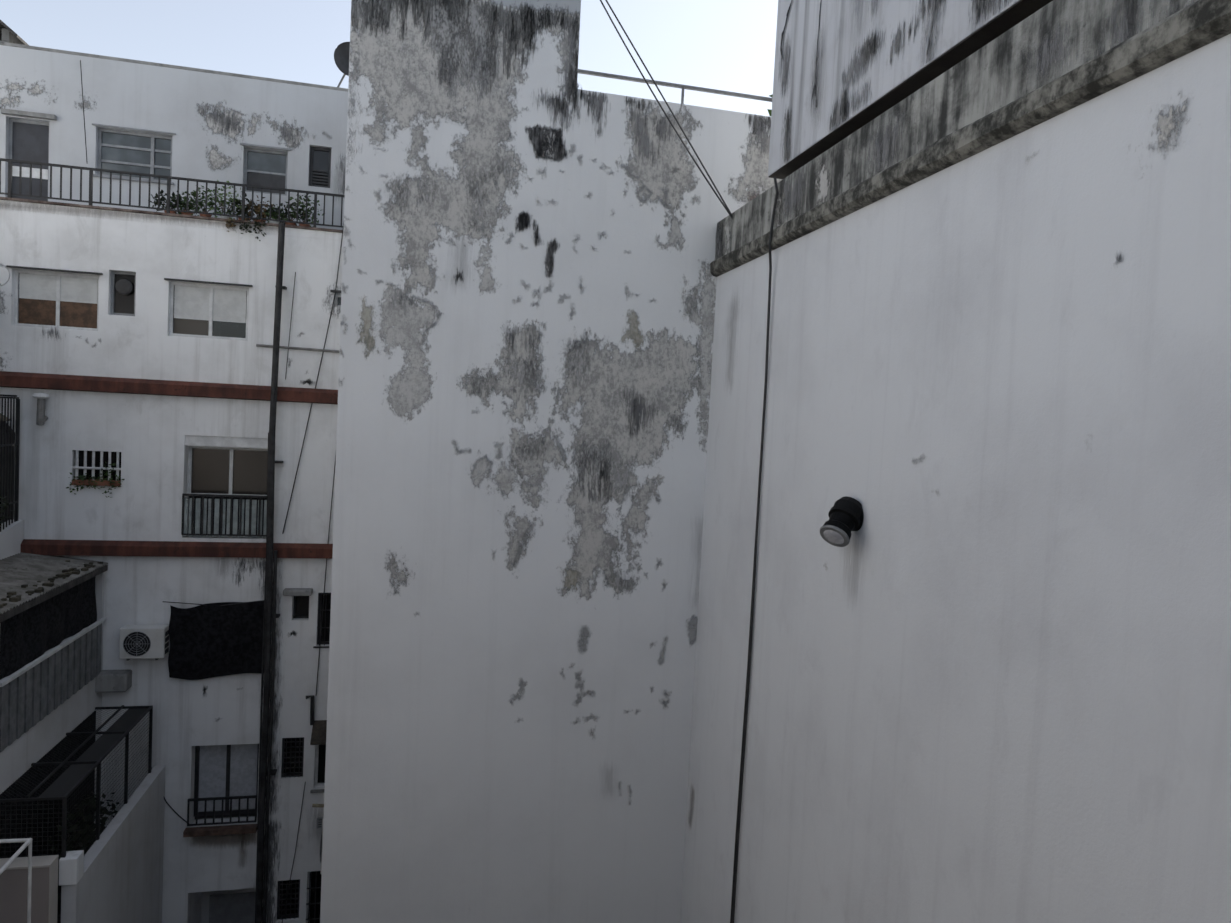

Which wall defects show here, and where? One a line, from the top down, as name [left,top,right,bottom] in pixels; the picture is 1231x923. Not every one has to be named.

damp [351,0,606,134]
damp [779,39,790,93]
damp [829,0,946,129]
damp [969,0,1009,24]
peeling [197,104,331,170]
peeling [325,0,701,420]
peeling [728,131,783,201]
damp [748,110,833,227]
peeling [453,262,716,600]
peeling [387,554,409,594]